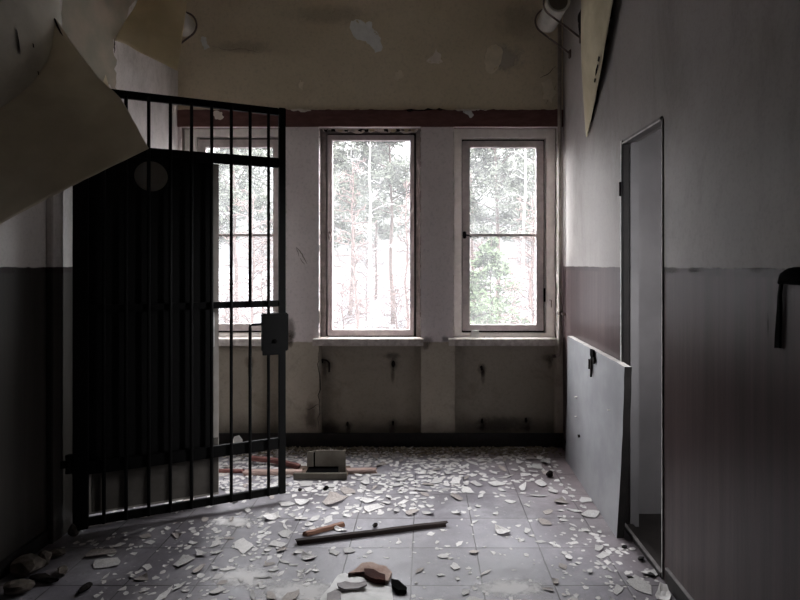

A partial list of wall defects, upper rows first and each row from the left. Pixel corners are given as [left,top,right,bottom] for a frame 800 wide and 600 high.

peeling [0,0,187,224]
peeling [350,19,383,53]